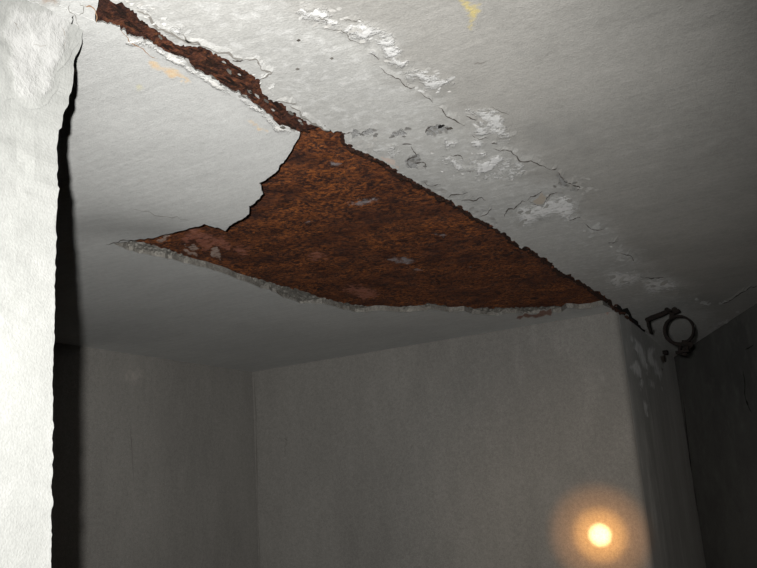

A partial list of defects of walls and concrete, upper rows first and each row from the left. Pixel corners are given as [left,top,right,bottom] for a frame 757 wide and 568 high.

rust [86,0,317,137]
flaking render [119,0,625,316]
crack [315,14,582,217]